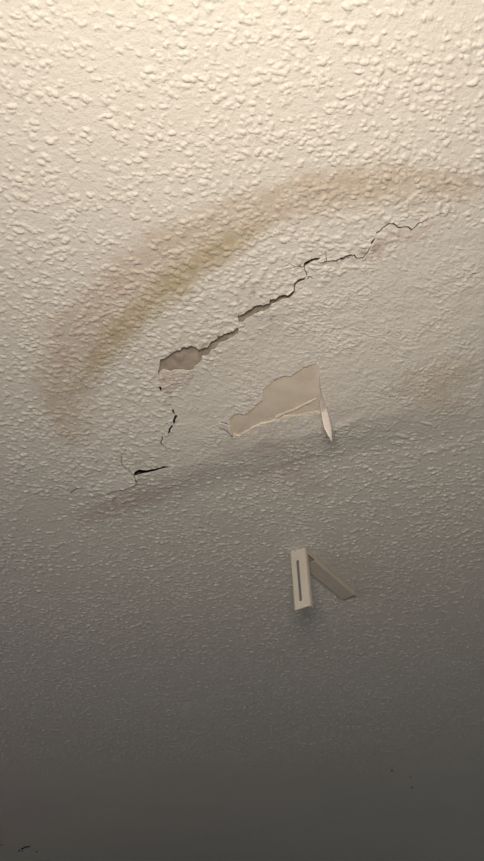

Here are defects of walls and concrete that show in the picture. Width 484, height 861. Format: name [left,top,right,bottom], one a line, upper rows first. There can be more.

crack [236,212,455,323]
crack [70,385,177,498]
spalling [158,314,250,393]
peeling [218,363,332,441]